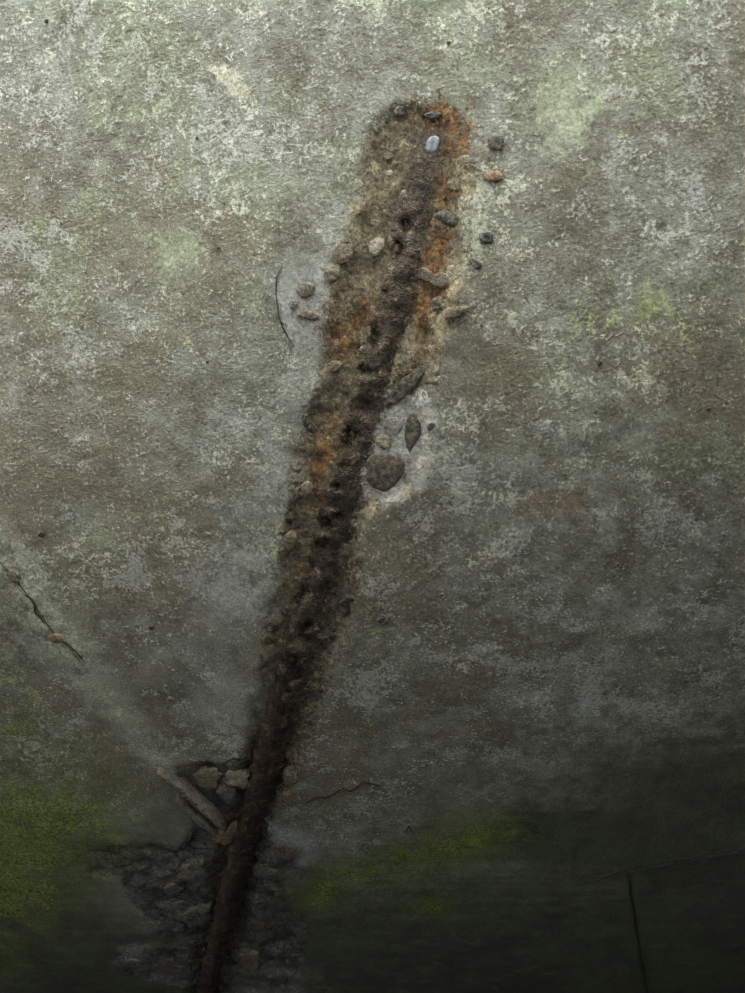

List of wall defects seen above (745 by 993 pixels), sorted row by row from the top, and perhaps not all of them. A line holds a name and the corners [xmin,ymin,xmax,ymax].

crack [0,562,85,663]
spalling [72,97,504,993]
crack [306,781,381,804]
rust [256,87,492,770]